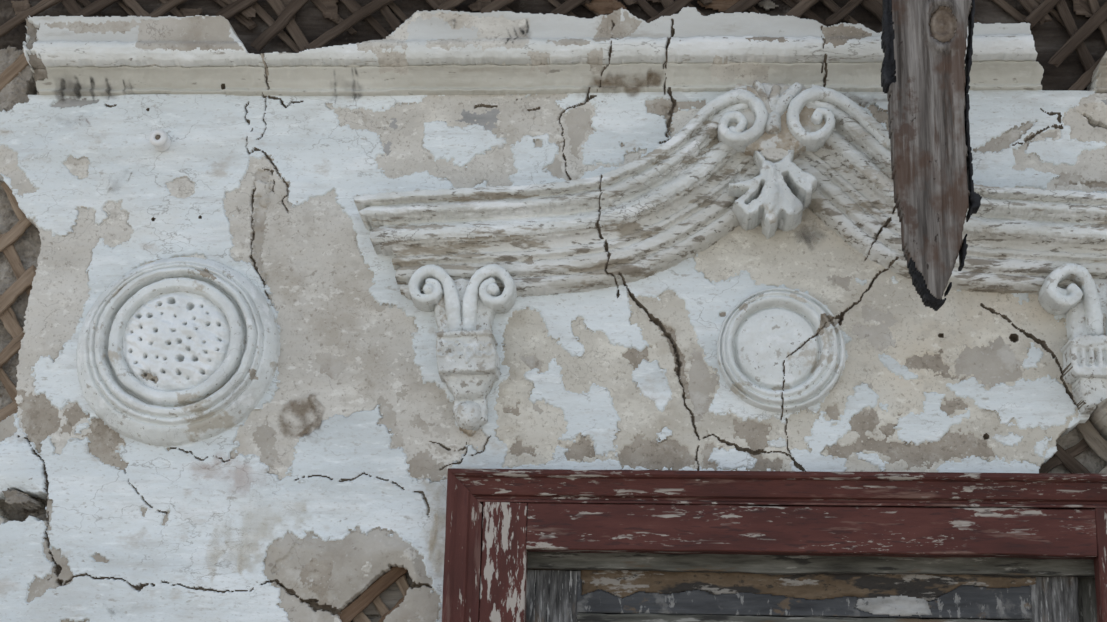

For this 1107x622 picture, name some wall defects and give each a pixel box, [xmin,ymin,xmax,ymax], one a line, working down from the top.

crack [244,56,303,299]
peeling [325,94,647,188]
crack [659,19,676,144]
peeling [973,108,1107,193]
peeling [0,145,133,470]
peeling [223,154,1107,483]
crack [595,174,899,471]
crack [980,303,1089,410]
flaking render [0,488,73,603]
crack [18,435,342,615]
peeling [263,526,441,622]
crack [295,472,430,517]